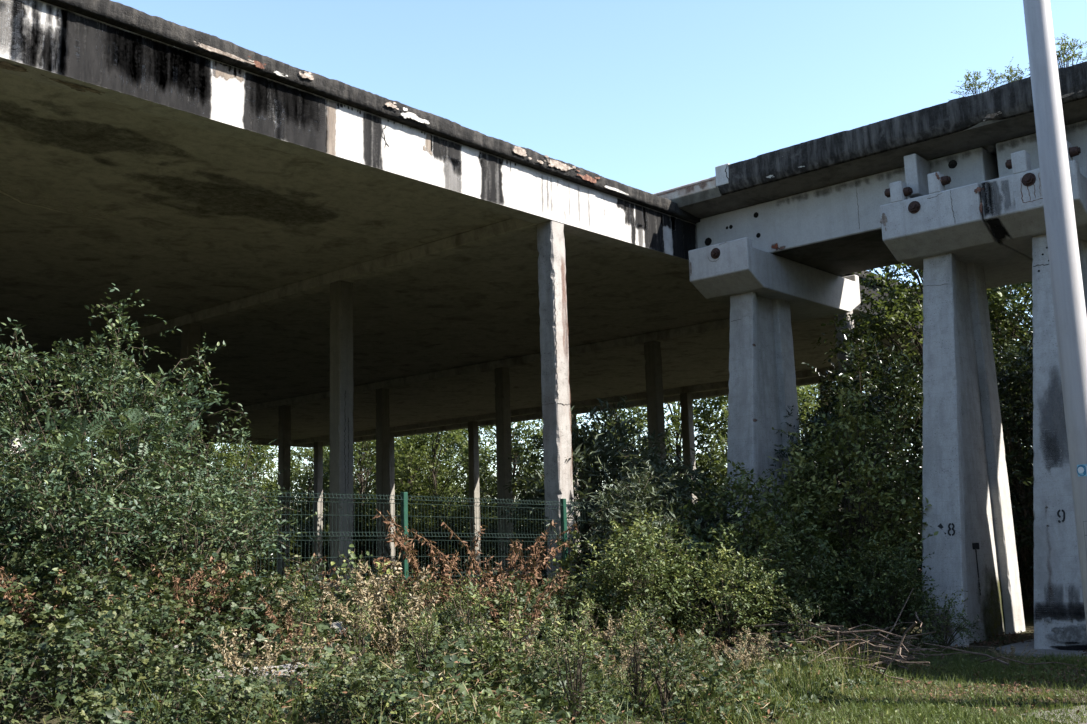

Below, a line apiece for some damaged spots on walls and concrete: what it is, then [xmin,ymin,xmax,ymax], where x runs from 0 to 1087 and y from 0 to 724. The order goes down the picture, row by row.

leakage [0,0,462,193]
spalling [385,102,430,124]
leakage [479,151,516,204]
leakage [589,193,696,260]
leakage [1040,372,1069,468]
leakage [1034,586,1085,621]